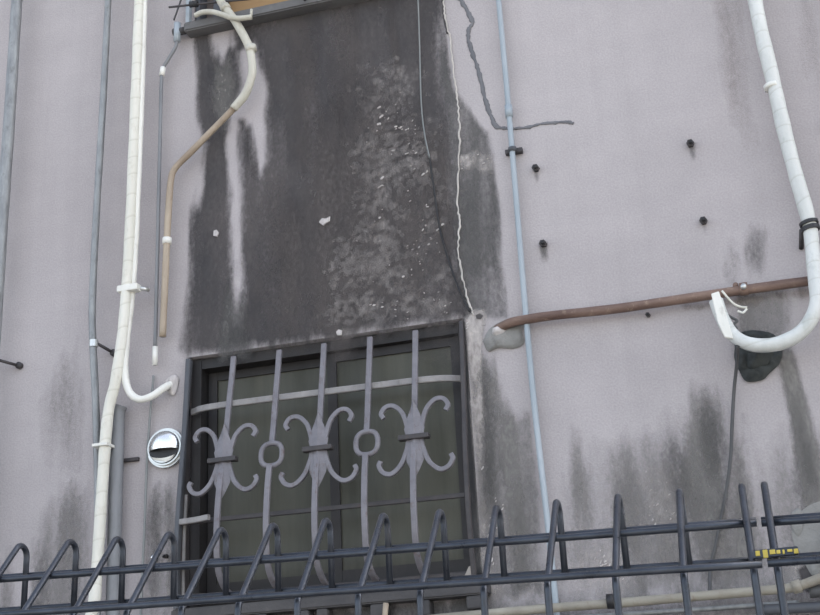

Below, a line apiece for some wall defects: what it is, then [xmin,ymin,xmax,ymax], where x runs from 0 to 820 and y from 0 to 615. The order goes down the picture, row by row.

water stain [440,51,501,314]
crack [441,0,574,315]
water stain [477,361,537,572]
water stain [685,401,755,560]
water stain [779,348,820,508]